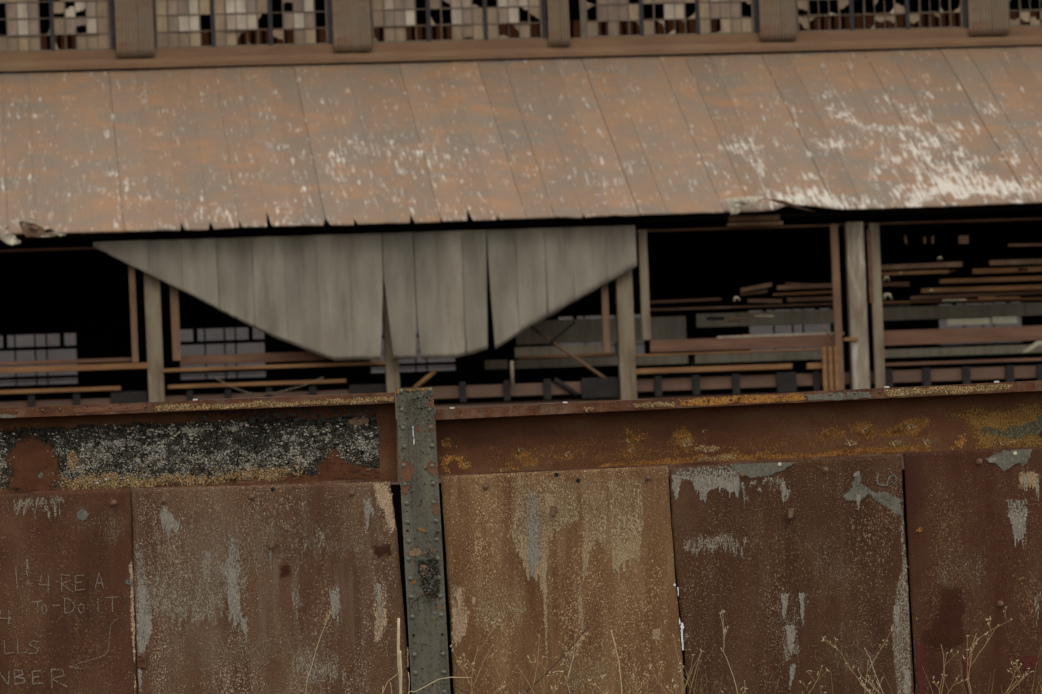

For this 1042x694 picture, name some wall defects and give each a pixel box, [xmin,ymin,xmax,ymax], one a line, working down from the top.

corrosion [3,433,303,492]
peeling [0,405,380,491]
corrosion [75,396,394,413]
corrosion [439,384,1042,474]